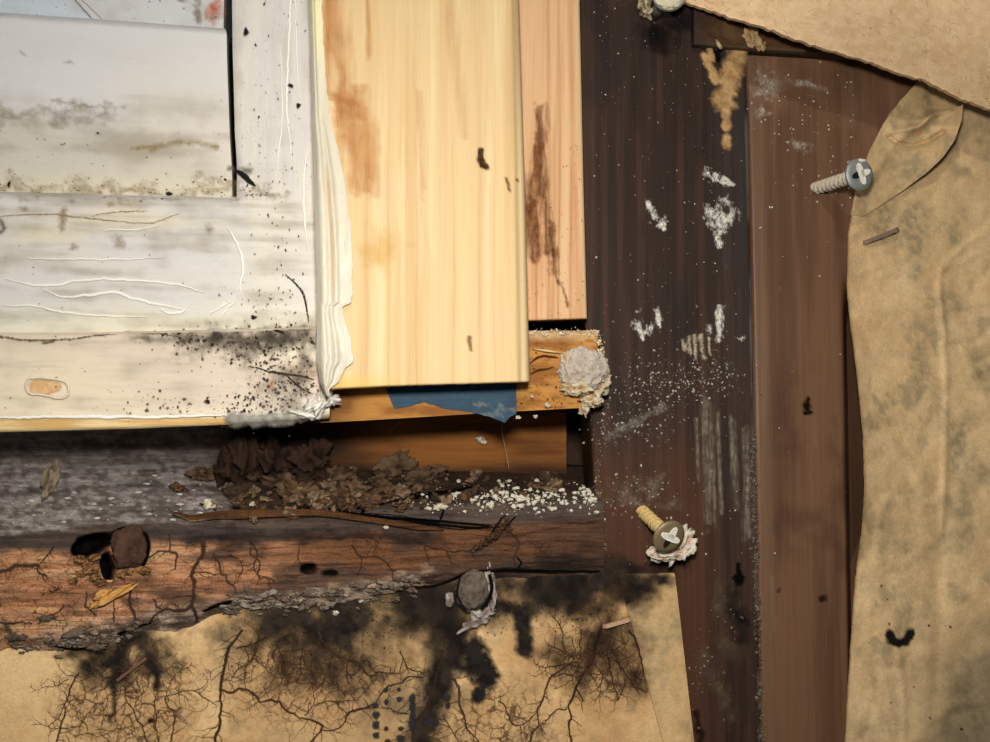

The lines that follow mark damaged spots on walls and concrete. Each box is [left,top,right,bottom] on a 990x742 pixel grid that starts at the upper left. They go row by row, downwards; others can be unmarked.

crack [3,210,180,224]
damp [138,201,319,434]
mould [280,530,441,545]
crack [203,600,238,612]
crack [53,622,152,651]
mould [230,554,675,742]
mould [65,630,182,722]